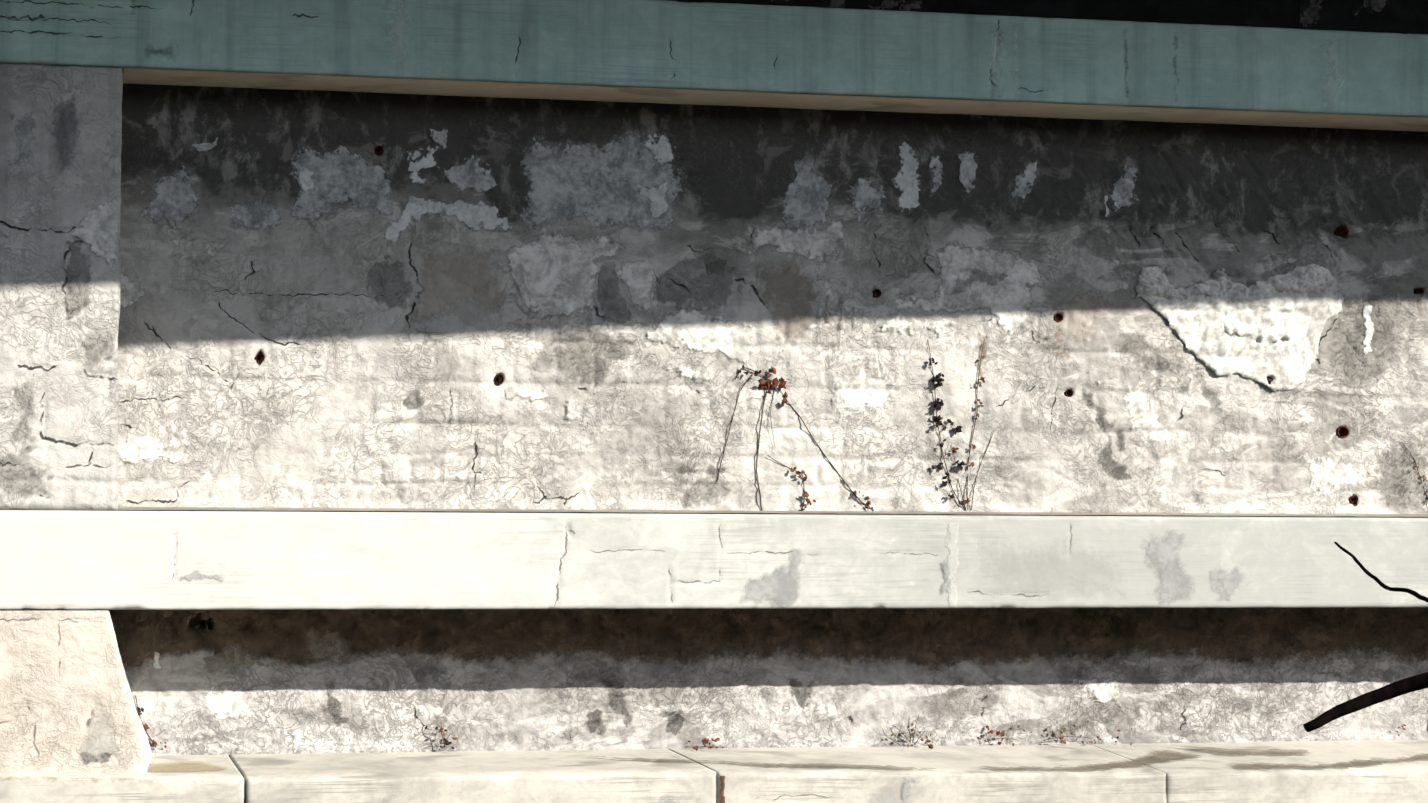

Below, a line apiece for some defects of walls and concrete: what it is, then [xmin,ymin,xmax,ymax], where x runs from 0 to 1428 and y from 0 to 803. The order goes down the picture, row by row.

crack [0,0,156,39]
leakage [892,142,978,212]
leakage [1104,164,1138,217]
crack [0,221,82,314]
peeling [228,129,754,382]
crack [534,489,816,607]